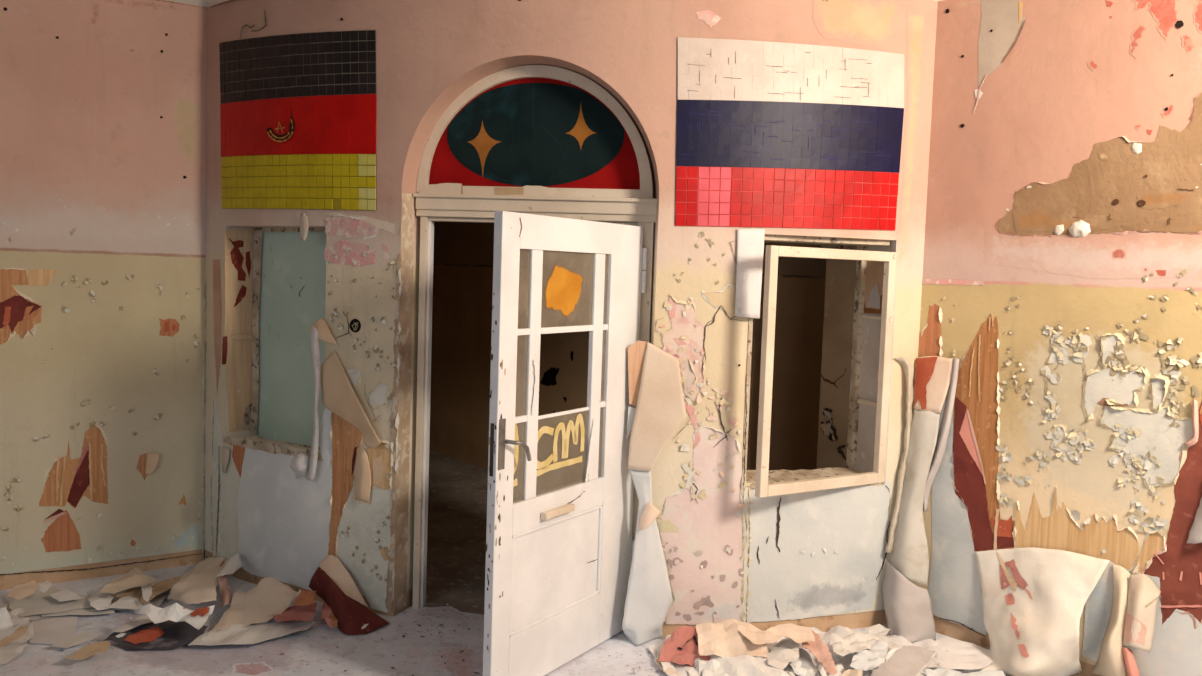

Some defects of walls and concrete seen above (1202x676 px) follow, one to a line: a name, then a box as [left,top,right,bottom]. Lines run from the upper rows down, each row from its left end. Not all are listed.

peeling [974,0,1025,113]
flaking render [996,91,1202,238]
peeling [1143,269,1200,313]
flaking render [236,183,649,613]
crack [701,306,747,504]
crack [757,497,781,564]
flaking render [656,231,891,625]
flaking render [928,400,987,635]
peeling [996,313,1202,537]
flaking render [1082,549,1202,676]